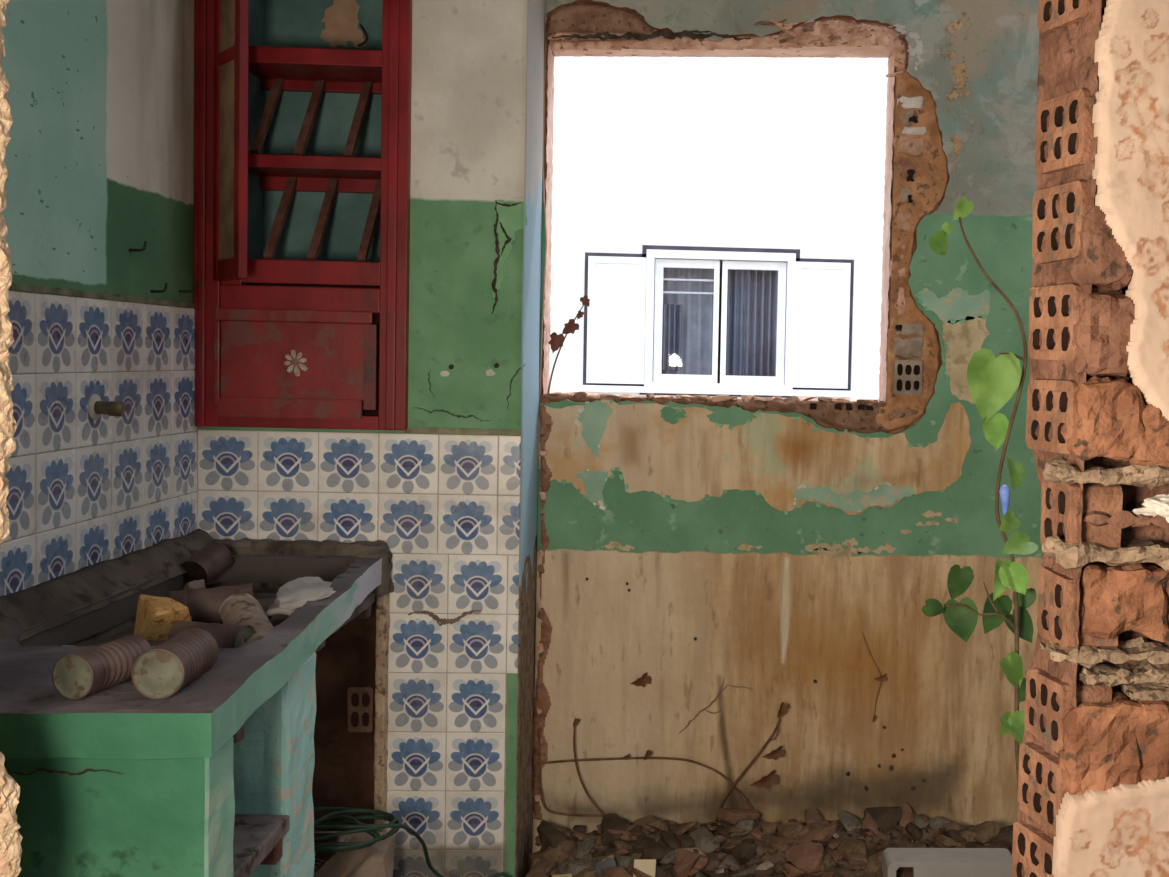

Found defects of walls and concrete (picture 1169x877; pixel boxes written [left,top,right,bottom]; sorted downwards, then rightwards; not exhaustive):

spalling [1038,0,1106,34]
peeling [532,0,990,820]
spalling [1011,89,1169,877]
damp [781,557,791,663]
damp [687,717,954,812]